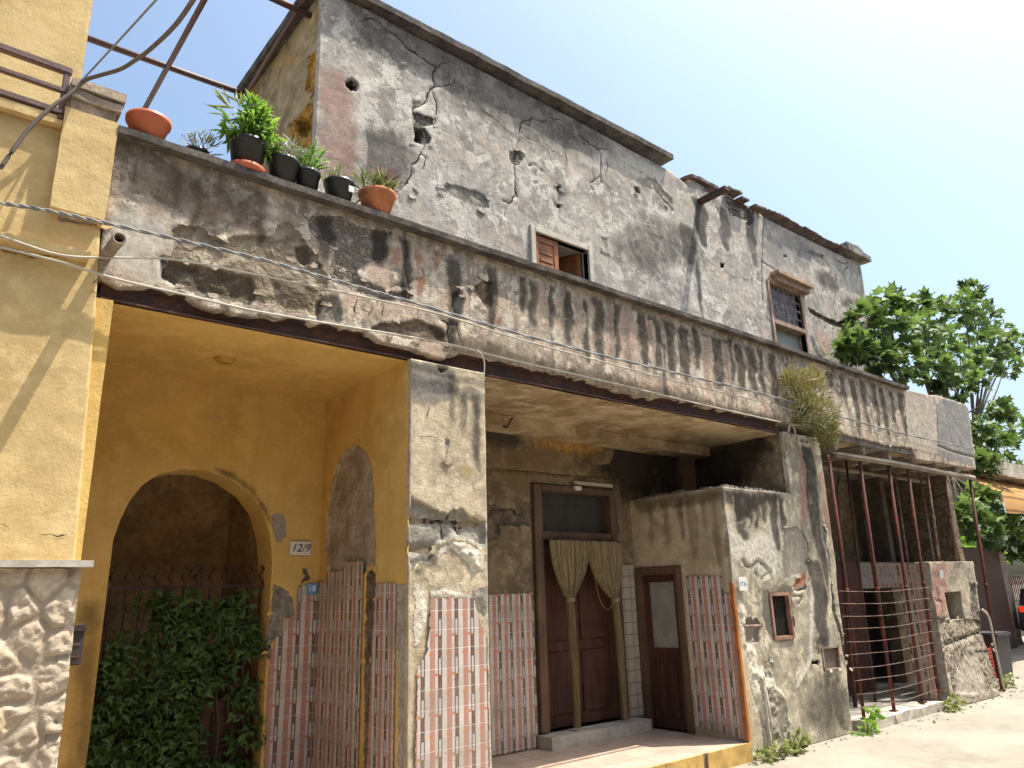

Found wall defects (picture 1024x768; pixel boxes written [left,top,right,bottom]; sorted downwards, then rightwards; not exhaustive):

flaking render [287,49,317,150]
crack [364,17,455,190]
crack [504,117,608,216]
flaking render [159,213,416,325]
leakage [372,231,389,264]
leakage [401,240,412,299]
leakage [682,197,731,308]
leakage [438,256,778,419]
leakage [827,374,906,436]
flaking render [407,497,532,569]
flaking render [323,440,377,768]
flaking render [938,581,1003,697]